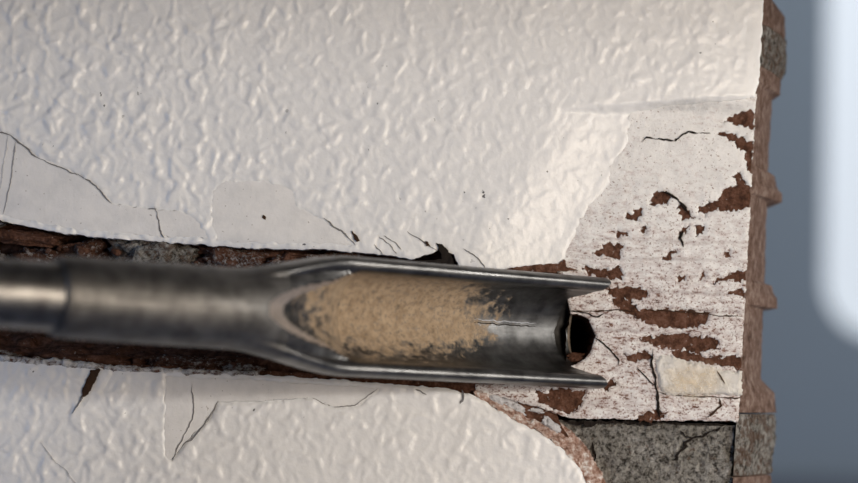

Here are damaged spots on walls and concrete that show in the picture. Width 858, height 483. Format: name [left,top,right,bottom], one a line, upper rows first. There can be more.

crack [643,131,711,142]
peeling [625,109,754,261]
spalling [417,241,454,265]
peeling [507,230,745,371]
spalling [473,387,606,483]
peeling [636,409,664,425]